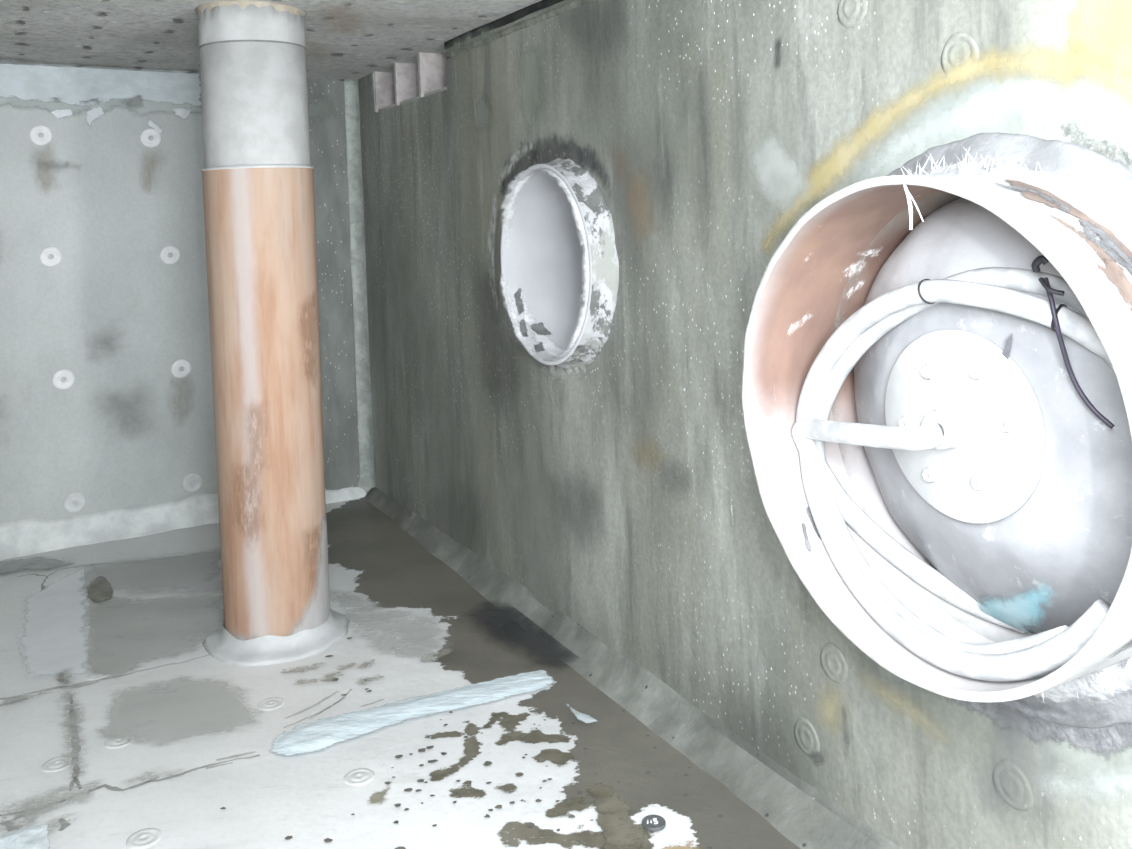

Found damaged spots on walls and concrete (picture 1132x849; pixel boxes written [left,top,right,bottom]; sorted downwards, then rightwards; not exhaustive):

peeling [0,0,202,133]
rust [764,50,1132,249]
peeling [514,288,551,352]
crack [18,549,219,590]
water stain [473,603,574,663]
crack [0,654,260,831]
spalling [951,698,1132,756]